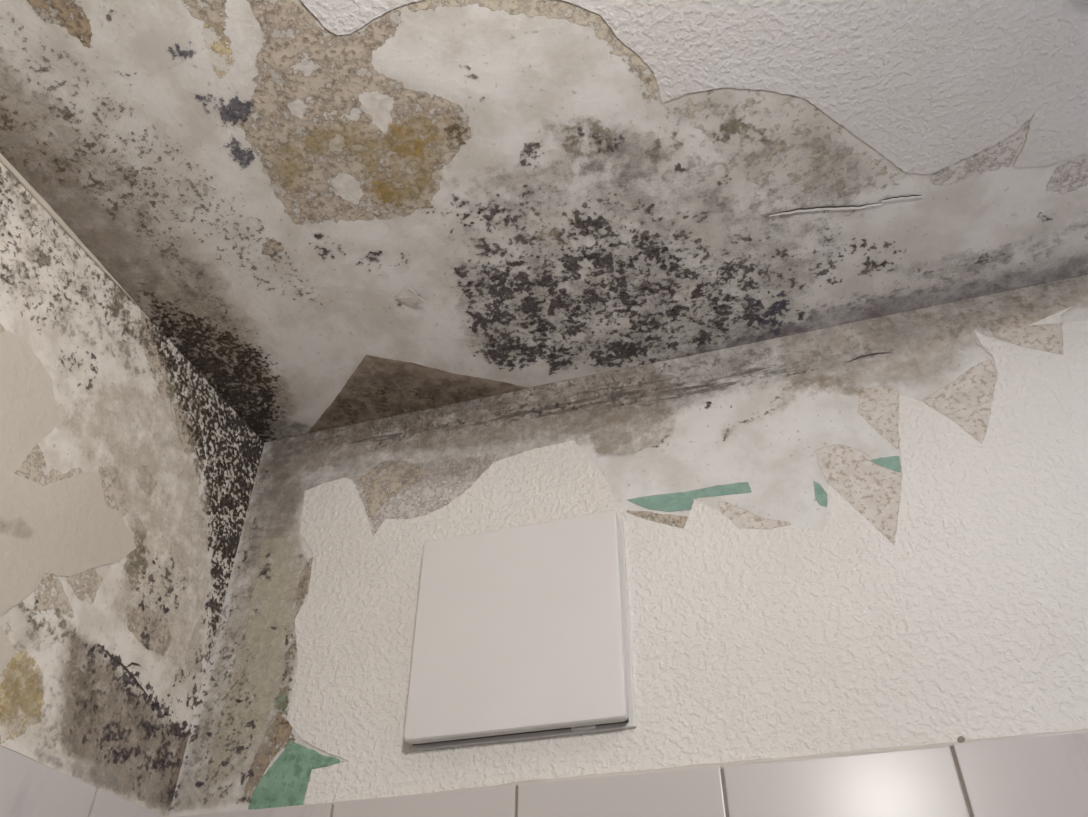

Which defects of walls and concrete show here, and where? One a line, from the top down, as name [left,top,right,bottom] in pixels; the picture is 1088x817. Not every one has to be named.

leakage [809,229,906,287]
leakage [842,259,1087,345]
leakage [0,18,823,810]